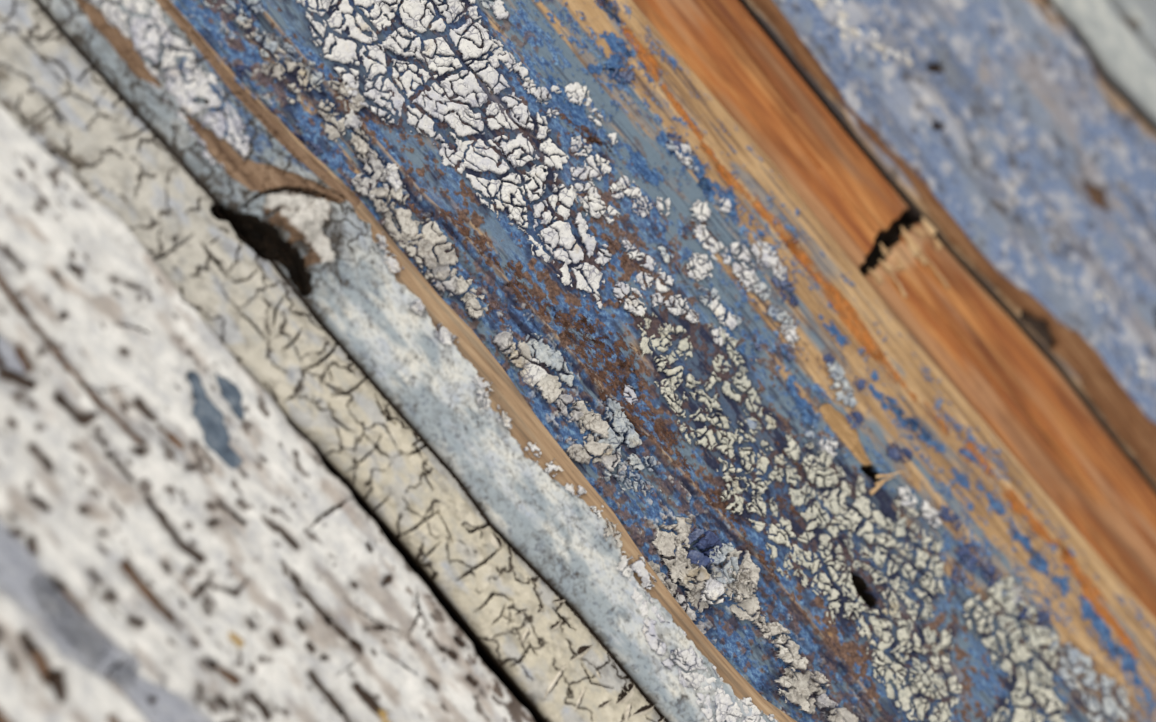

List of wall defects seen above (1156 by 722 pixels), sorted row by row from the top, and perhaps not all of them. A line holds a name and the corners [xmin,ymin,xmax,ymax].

peeling [75,0,346,203]
peeling [203,0,671,320]
crack [859,216,920,276]
peeling [0,277,146,456]
crack [20,0,667,722]
peeling [145,496,205,563]
peeling [205,659,271,720]
peeling [308,671,350,722]
peeling [291,577,385,660]
peeling [353,683,383,718]
peeling [493,331,859,722]
peeling [613,198,1132,722]